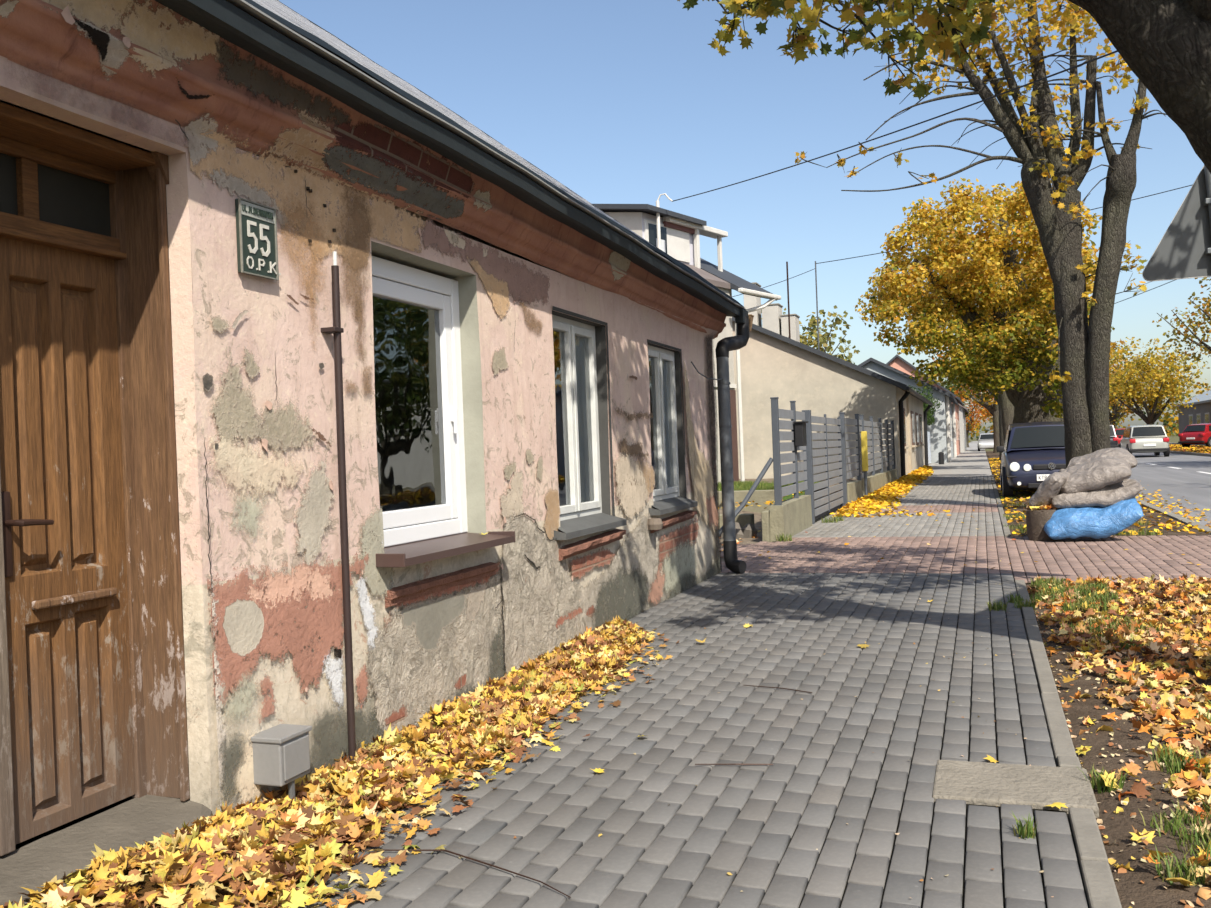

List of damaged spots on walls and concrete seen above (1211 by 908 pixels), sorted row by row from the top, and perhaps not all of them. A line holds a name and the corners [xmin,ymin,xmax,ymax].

flaking render [41,0,492,263]
peeling [202,347,341,609]
flaking render [444,229,510,319]
flaking render [492,348,509,375]
flaking render [359,361,719,732]